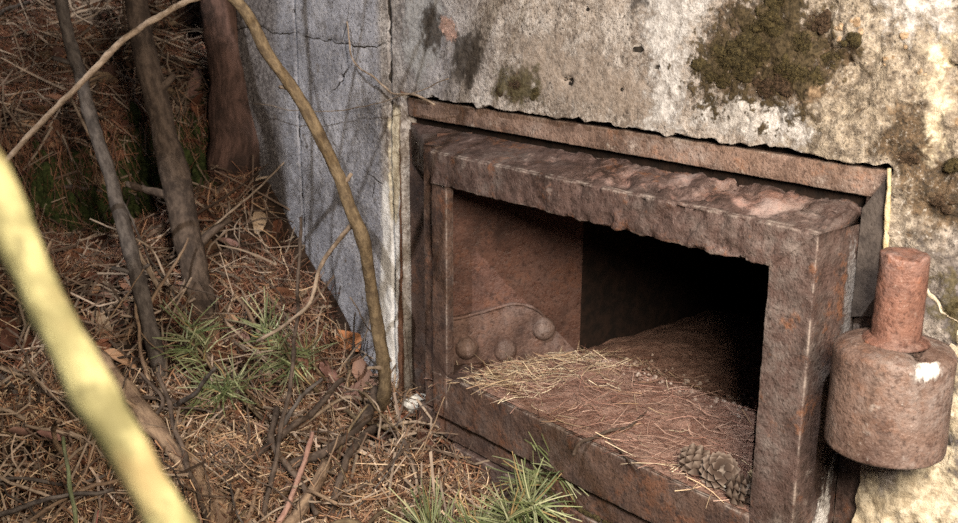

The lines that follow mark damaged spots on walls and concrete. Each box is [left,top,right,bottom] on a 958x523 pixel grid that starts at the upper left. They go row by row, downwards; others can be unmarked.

leakage [509,0,814,148]
rust [806,85,823,103]